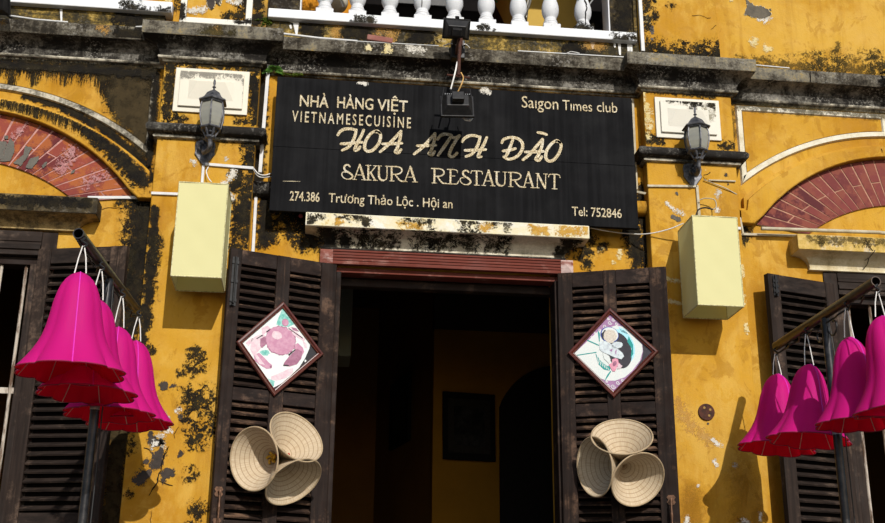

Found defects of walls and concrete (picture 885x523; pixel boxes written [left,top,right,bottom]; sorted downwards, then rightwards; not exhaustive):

peeling [187,0,242,15]
peeling [744,0,773,25]
leakage [735,41,885,75]
peeling [0,123,79,177]
leakage [0,57,515,356]
leakage [552,228,610,272]
leakage [620,217,648,269]
leakage [176,344,219,452]
spalling [132,406,184,487]